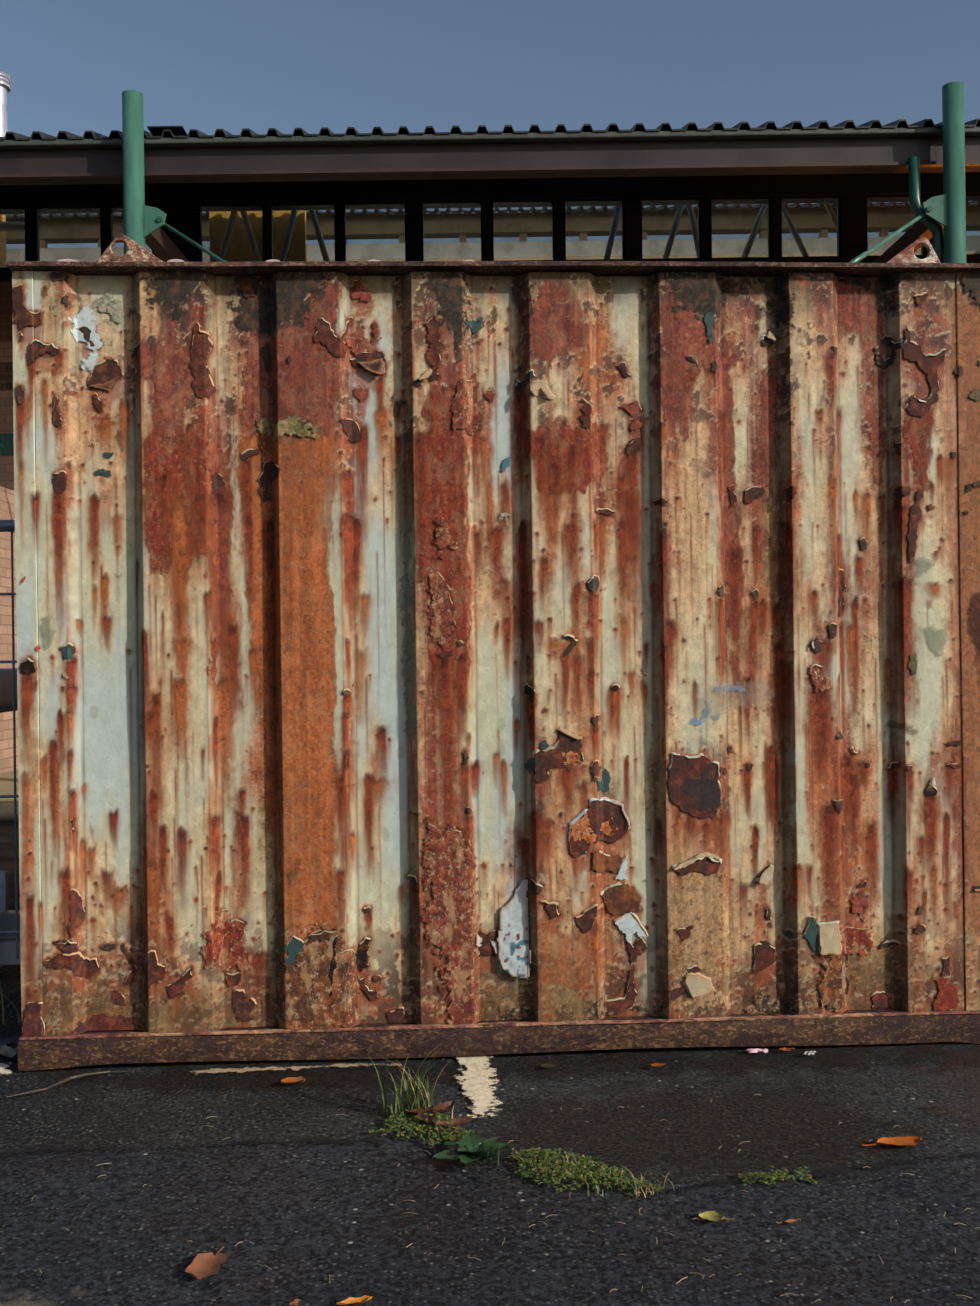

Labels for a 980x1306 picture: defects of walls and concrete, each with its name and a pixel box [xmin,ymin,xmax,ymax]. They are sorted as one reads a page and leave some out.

rust [12,284,67,601]
peeling [62,295,119,412]
rust [87,277,669,945]
rust [657,296,792,740]
rust [854,295,980,934]
rust [21,658,124,978]
rust [71,630,193,1035]
peeling [341,937,381,985]
peeling [473,880,531,978]
peeling [592,766,631,829]
peeling [683,973,716,998]
peeling [783,916,870,955]